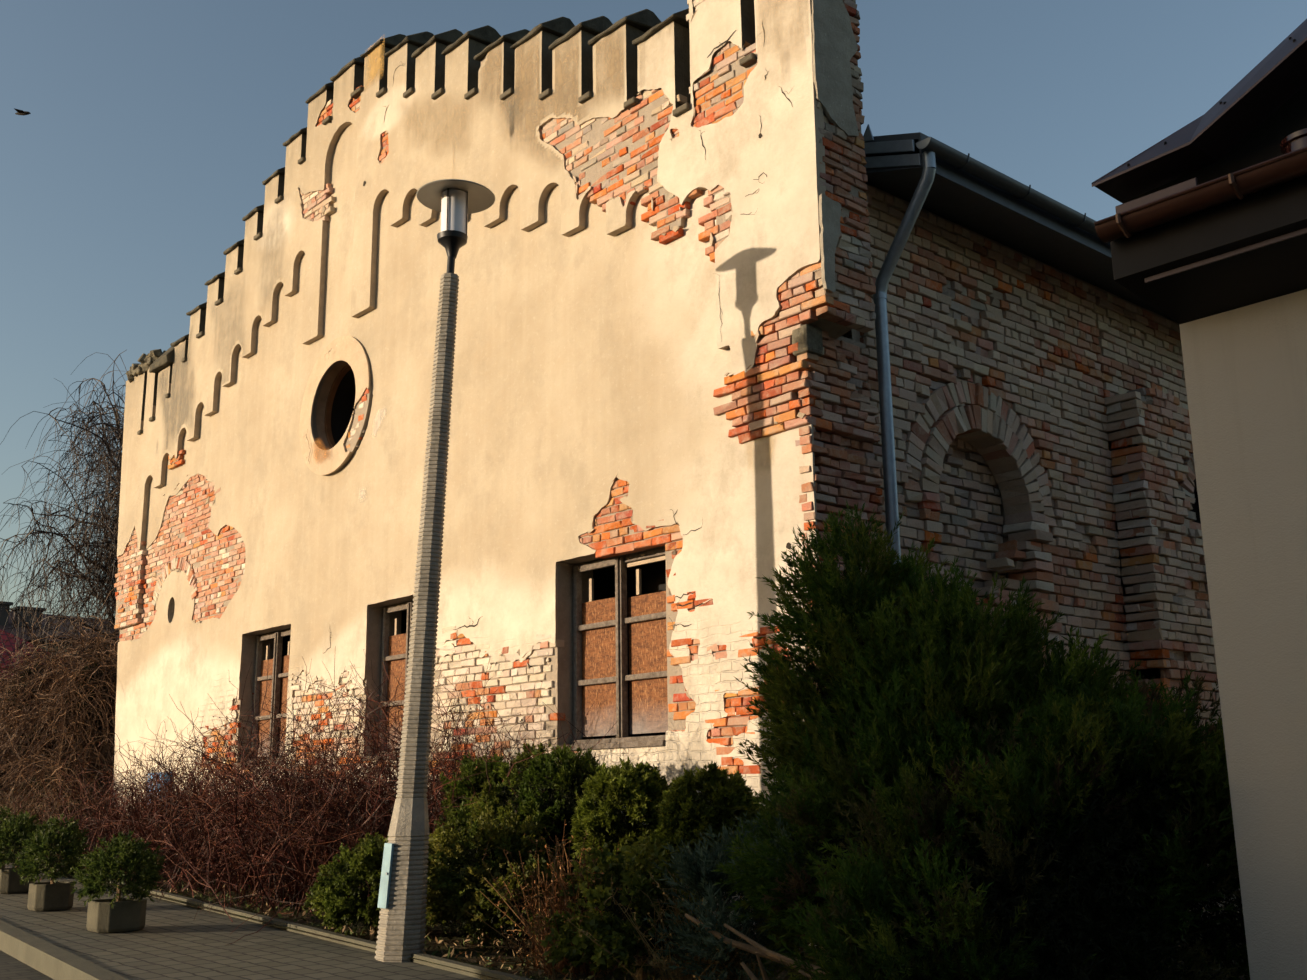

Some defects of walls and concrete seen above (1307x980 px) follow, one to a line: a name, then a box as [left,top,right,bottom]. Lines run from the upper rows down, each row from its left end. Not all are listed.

spalling [686,0,705,23]
spalling [300,183,336,222]
spalling [316,85,364,126]
spalling [379,130,389,164]
spalling [537,41,758,263]
spalling [713,262,834,444]
spalling [114,449,246,641]
spalling [579,475,787,778]
spalling [202,694,262,785]
spalling [290,664,381,798]
spalling [427,626,578,795]